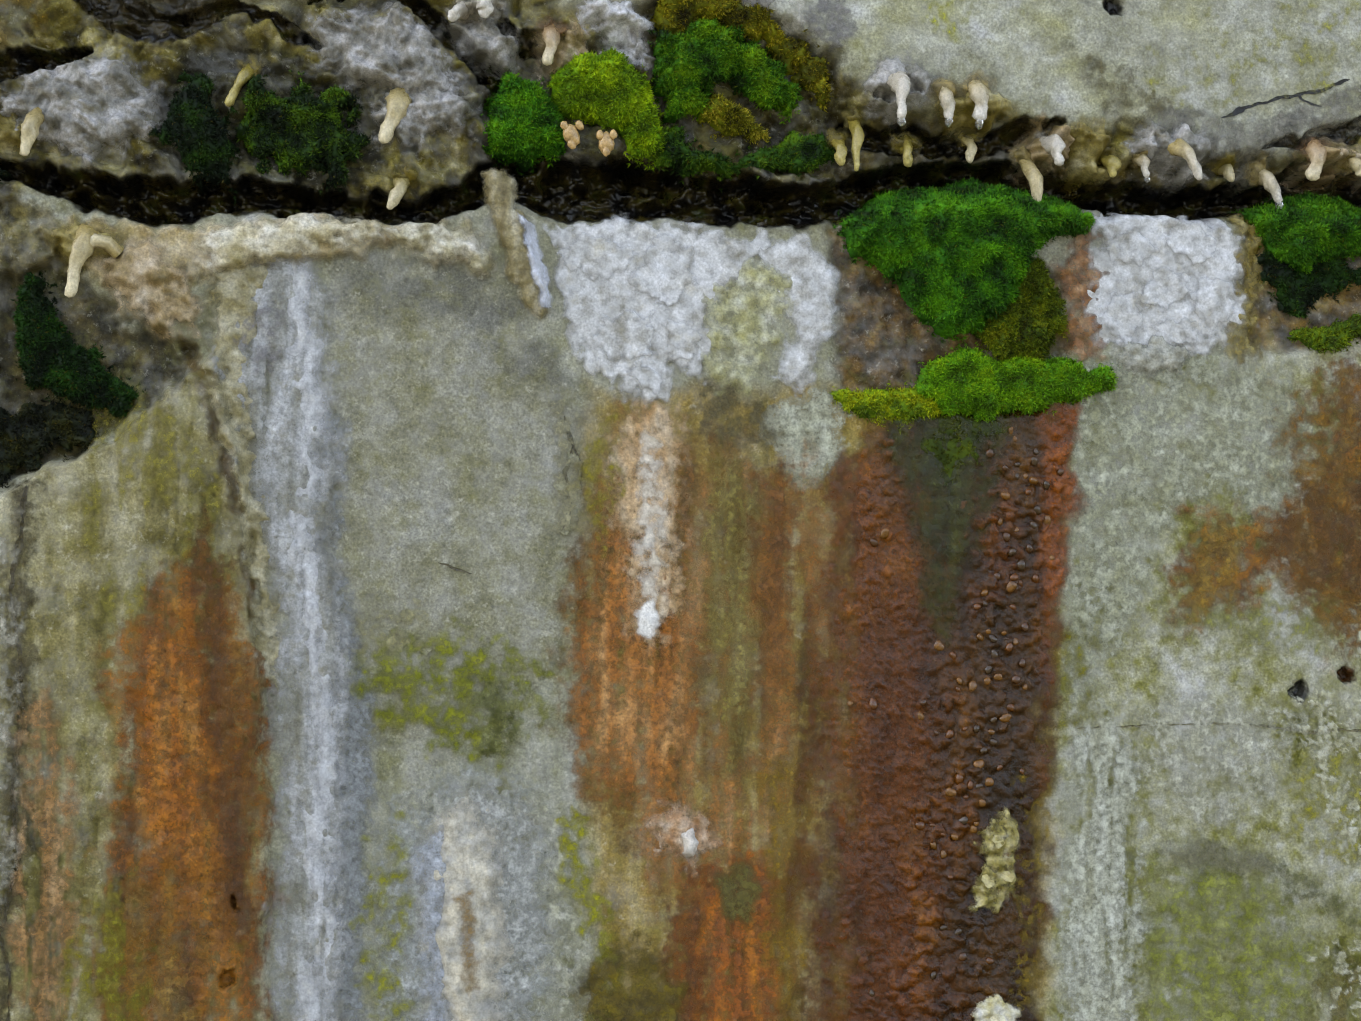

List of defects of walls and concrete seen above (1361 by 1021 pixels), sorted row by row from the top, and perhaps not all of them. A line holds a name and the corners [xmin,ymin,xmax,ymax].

crack [0,45,94,83]
crack [308,0,344,8]
crack [398,0,542,96]
crack [0,79,1361,230]
rust [7,508,285,1021]
leakage [215,259,378,1021]
rust [558,400,1084,1021]
rust [1164,359,1361,655]